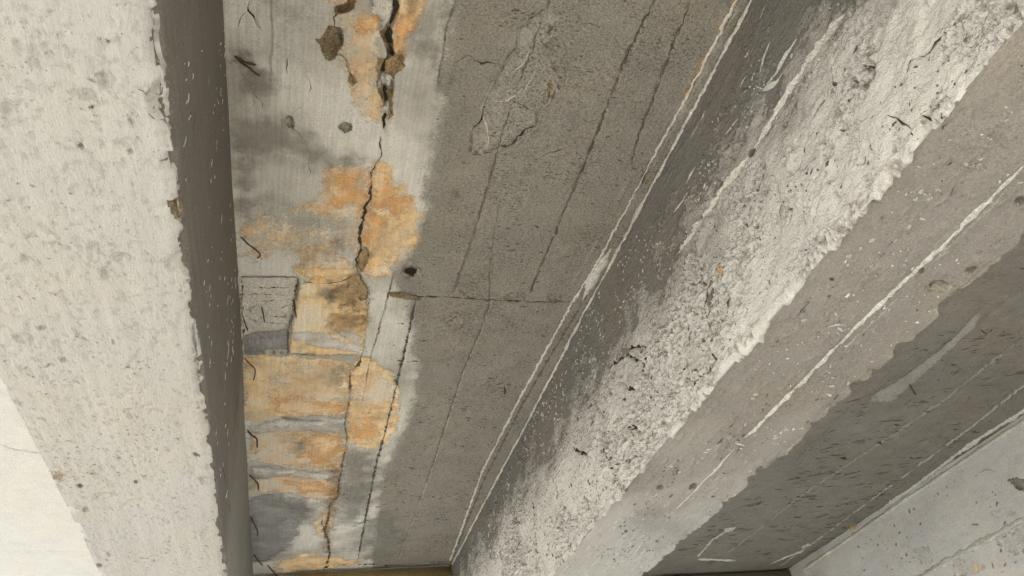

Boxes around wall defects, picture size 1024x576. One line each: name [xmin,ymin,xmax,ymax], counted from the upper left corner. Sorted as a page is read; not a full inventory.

spalling [315,26,344,61]
spalling [337,122,353,133]
spalling [370,0,407,119]
crack [630,4,690,162]
spalling [240,276,300,356]
rust [235,162,423,573]
leakage [211,0,456,574]
crack [305,0,655,565]
peeling [452,0,1024,576]